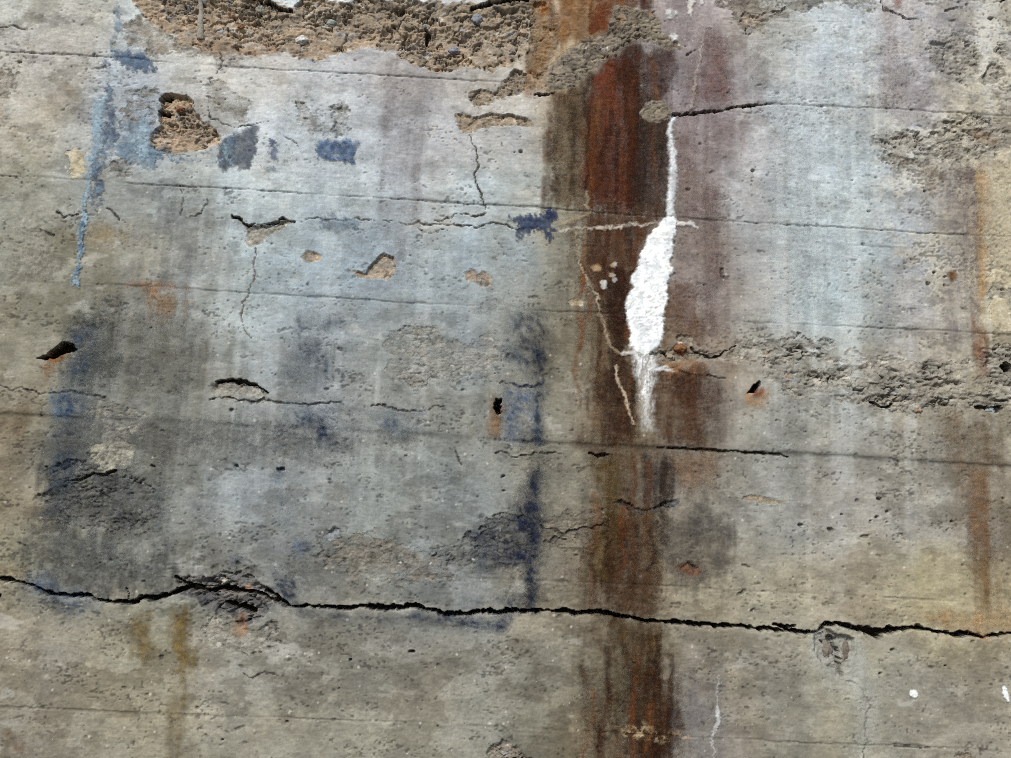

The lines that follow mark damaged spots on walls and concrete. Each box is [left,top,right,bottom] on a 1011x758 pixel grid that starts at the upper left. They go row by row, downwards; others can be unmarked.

spalling [64,81,222,208]
crack [179,188,209,219]
spalling [208,382,270,401]
crack [231,134,539,339]
spalling [101,0,682,139]
corrosion [557,0,651,42]
corrosion [542,44,692,758]
damp [611,117,696,411]
corrosion [651,365,720,446]
crack [670,102,777,119]
spalling [657,251,1011,415]
crack [0,575,1011,758]